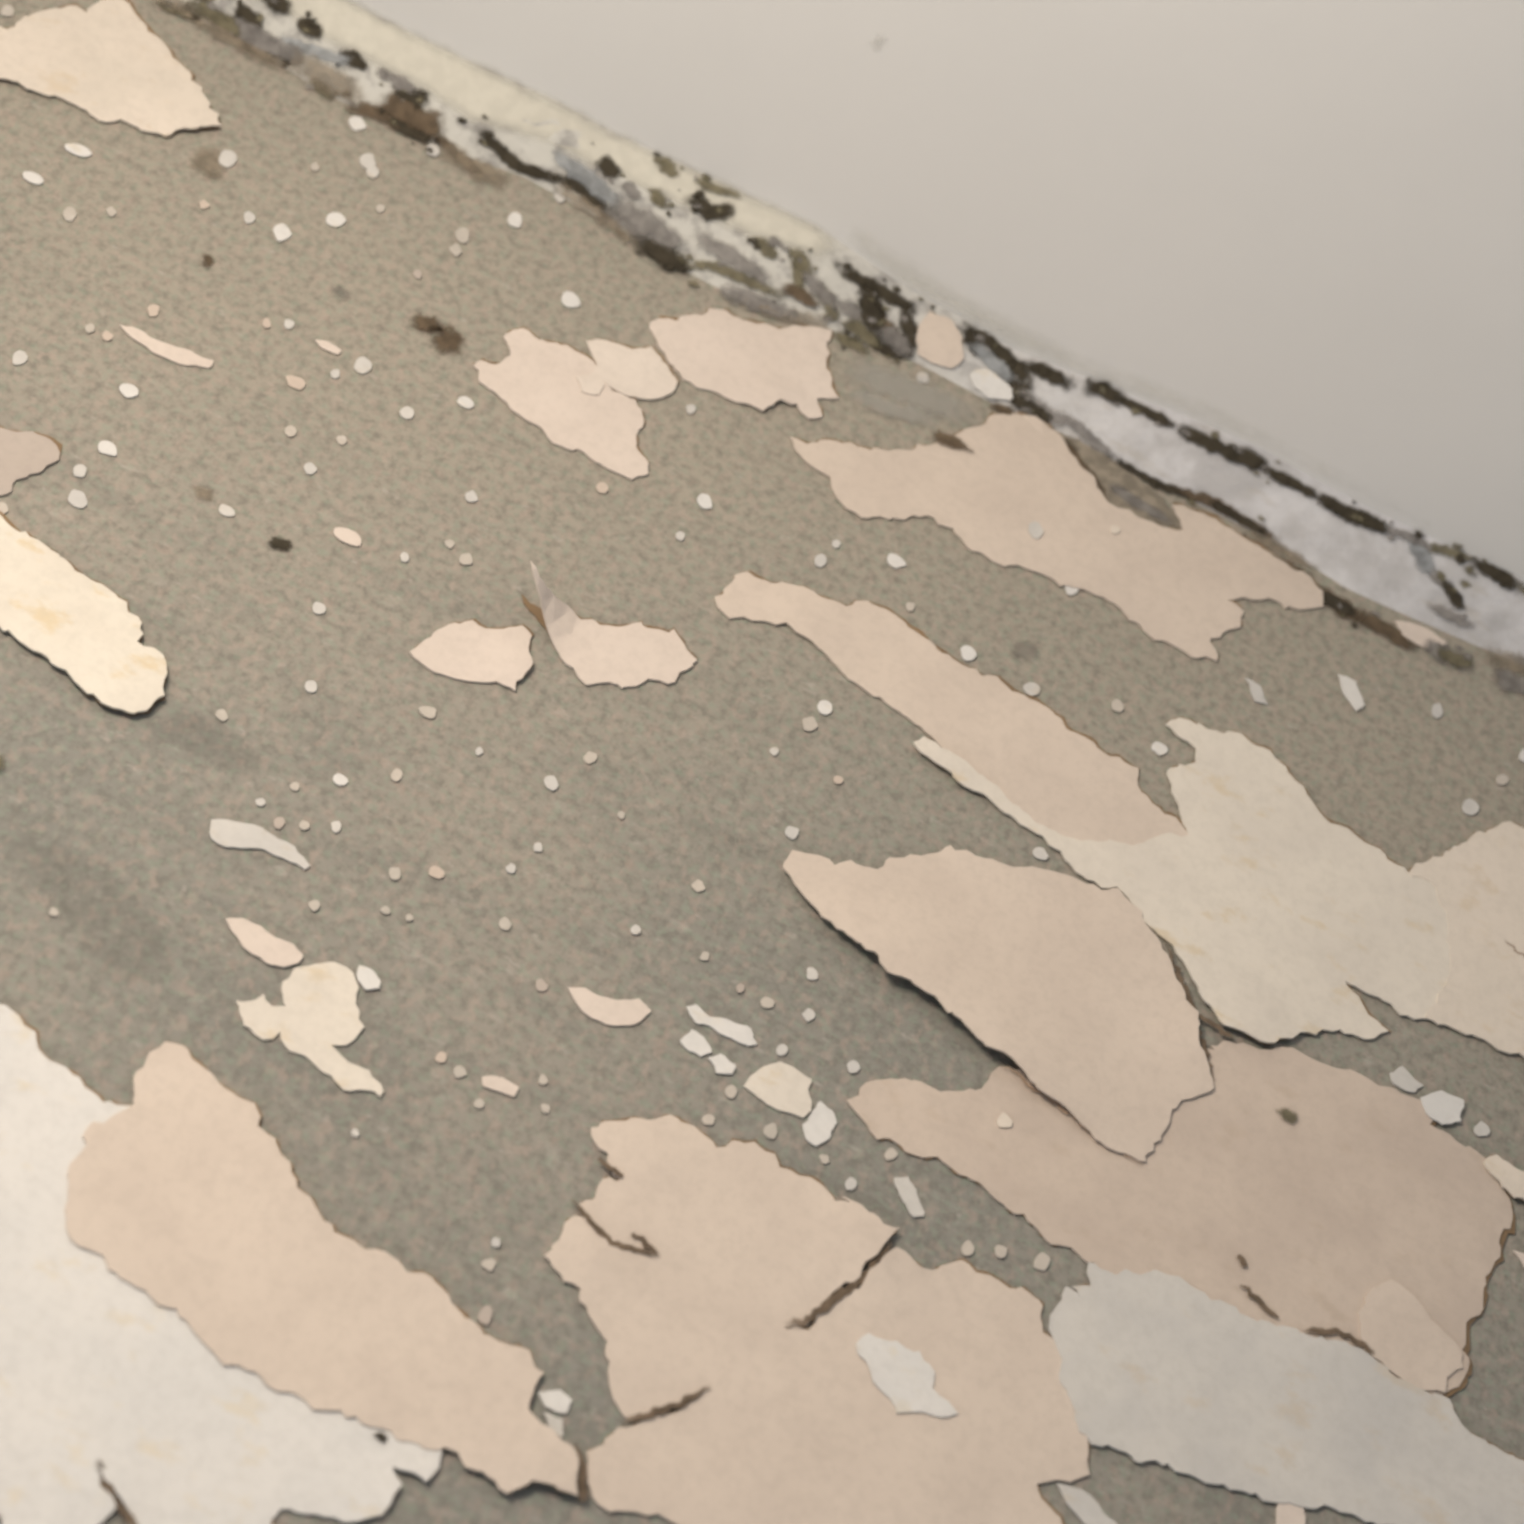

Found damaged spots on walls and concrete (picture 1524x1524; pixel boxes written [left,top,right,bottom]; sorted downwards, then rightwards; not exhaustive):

leakage [156,0,935,364]
peeling [0,425,168,716]
leakage [269,537,292,551]
peeling [473,308,840,480]
leakage [934,429,972,452]
peeling [790,412,1325,662]
leakage [962,322,1524,672]
peeling [0,561,1524,1524]
crack [573,1200,657,1256]
crack [792,1242,891,1327]
crack [573,1444,588,1502]
crack [626,1387,708,1422]